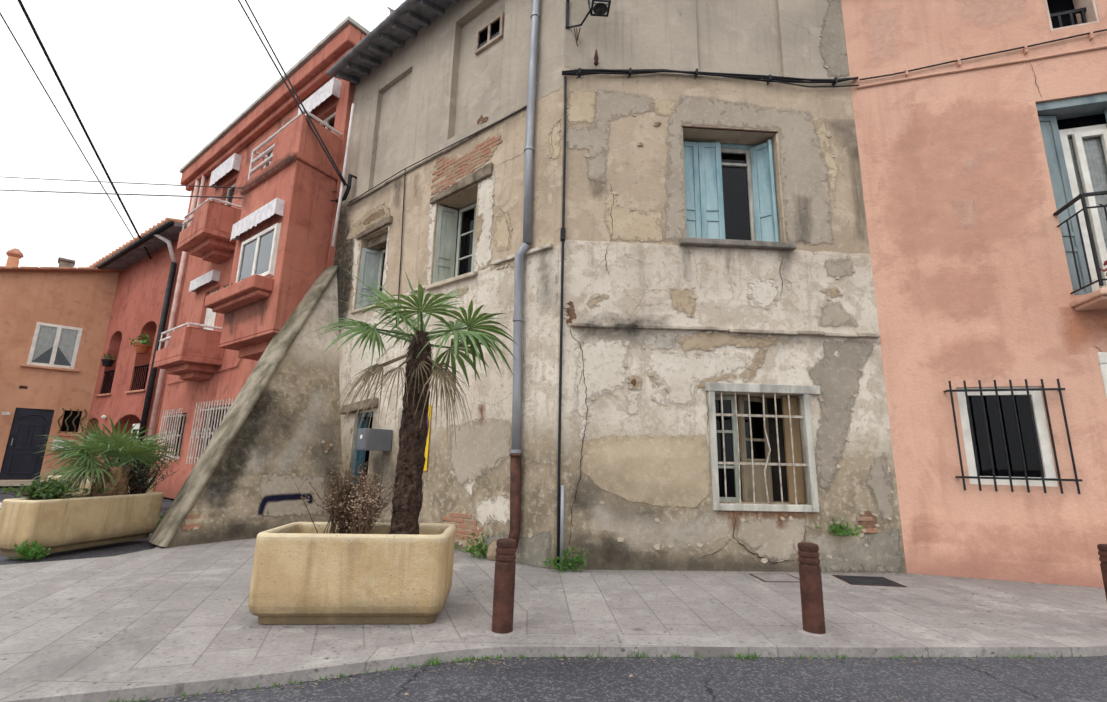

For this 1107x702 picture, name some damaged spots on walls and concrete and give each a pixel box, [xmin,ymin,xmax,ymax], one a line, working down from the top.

flaking render [548,90,598,159]
flaking render [431,132,503,195]
flaking render [670,287,698,317]
flaking render [747,276,779,310]
flaking render [820,287,843,309]
flaking render [574,331,789,440]
leakage [207,391,272,498]
crack [568,311,588,543]
flaking render [443,477,510,555]
crack [698,518,807,564]
flaking render [856,511,880,561]